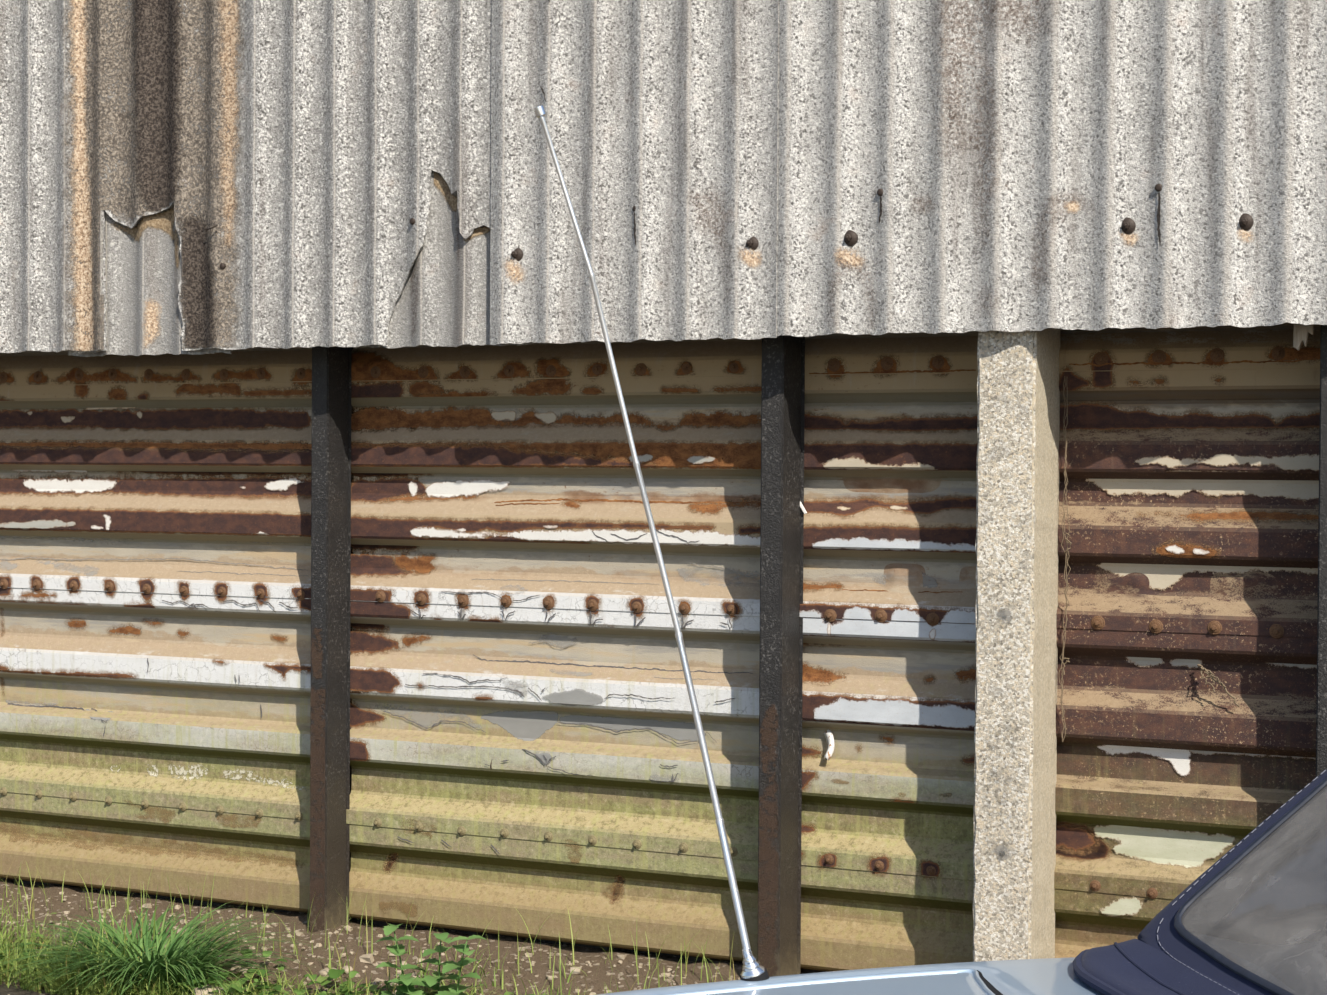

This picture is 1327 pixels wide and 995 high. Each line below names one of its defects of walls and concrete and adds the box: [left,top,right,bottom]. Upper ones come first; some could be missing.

leakage [63,0,244,351]
peeling [12,470,117,493]
rust [0,366,312,537]
peeling [407,479,511,498]
rust [804,412,978,471]
peeling [1086,453,1319,501]
rust [803,495,977,553]
rust [350,351,761,761]
peeling [1097,539,1318,590]
peeling [814,697,975,760]
rust [1056,821,1111,861]
peeling [1093,824,1236,868]